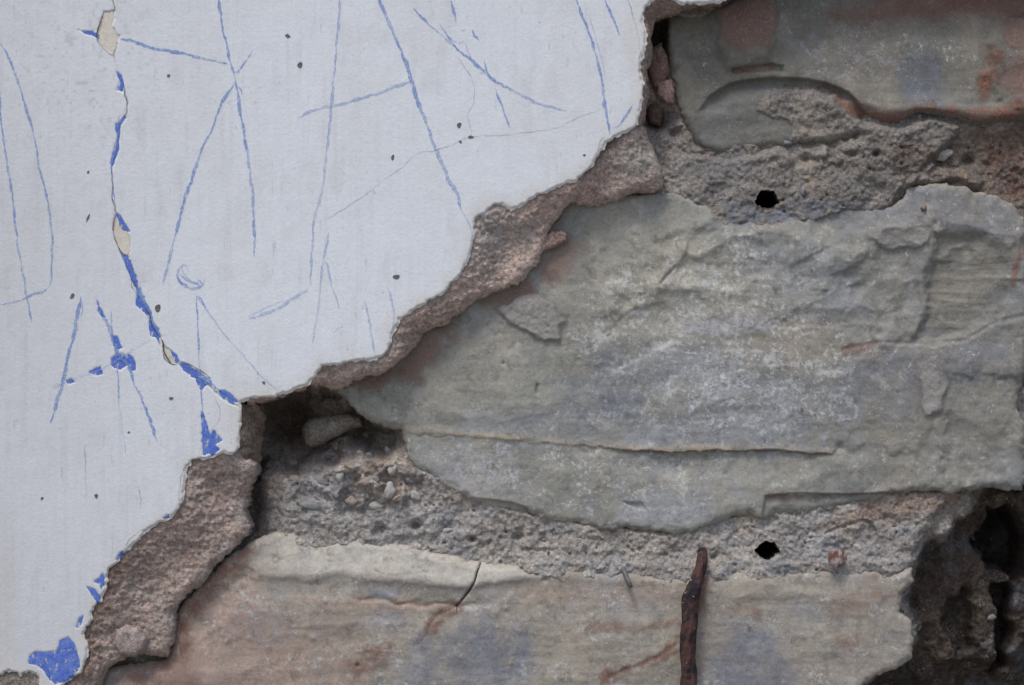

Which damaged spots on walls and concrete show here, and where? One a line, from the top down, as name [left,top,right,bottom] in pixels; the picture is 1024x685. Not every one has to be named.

crack [83,0,238,404]
flaking render [631,0,723,131]
flaking render [0,173,585,685]
crack [456,563,481,614]